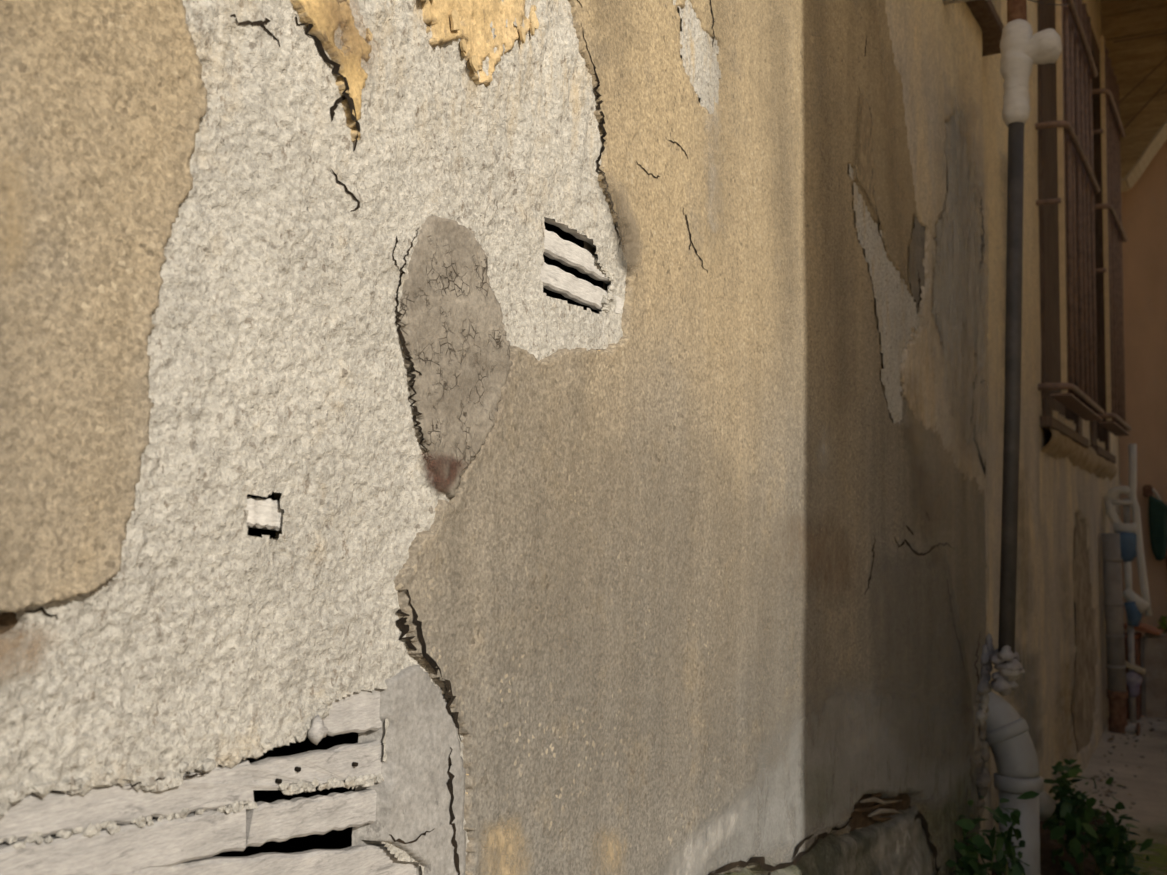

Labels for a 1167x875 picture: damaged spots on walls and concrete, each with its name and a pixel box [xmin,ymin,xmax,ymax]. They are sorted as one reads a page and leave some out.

crack [231,14,360,150]
crack [331,169,360,211]
damp [618,185,641,269]
crack [392,228,428,464]
peeling [0,0,627,875]
peeling [394,0,987,875]
crack [865,512,955,593]
crack [389,589,461,875]
crack [709,817,852,875]
damp [675,690,974,875]
crack [908,805,941,875]